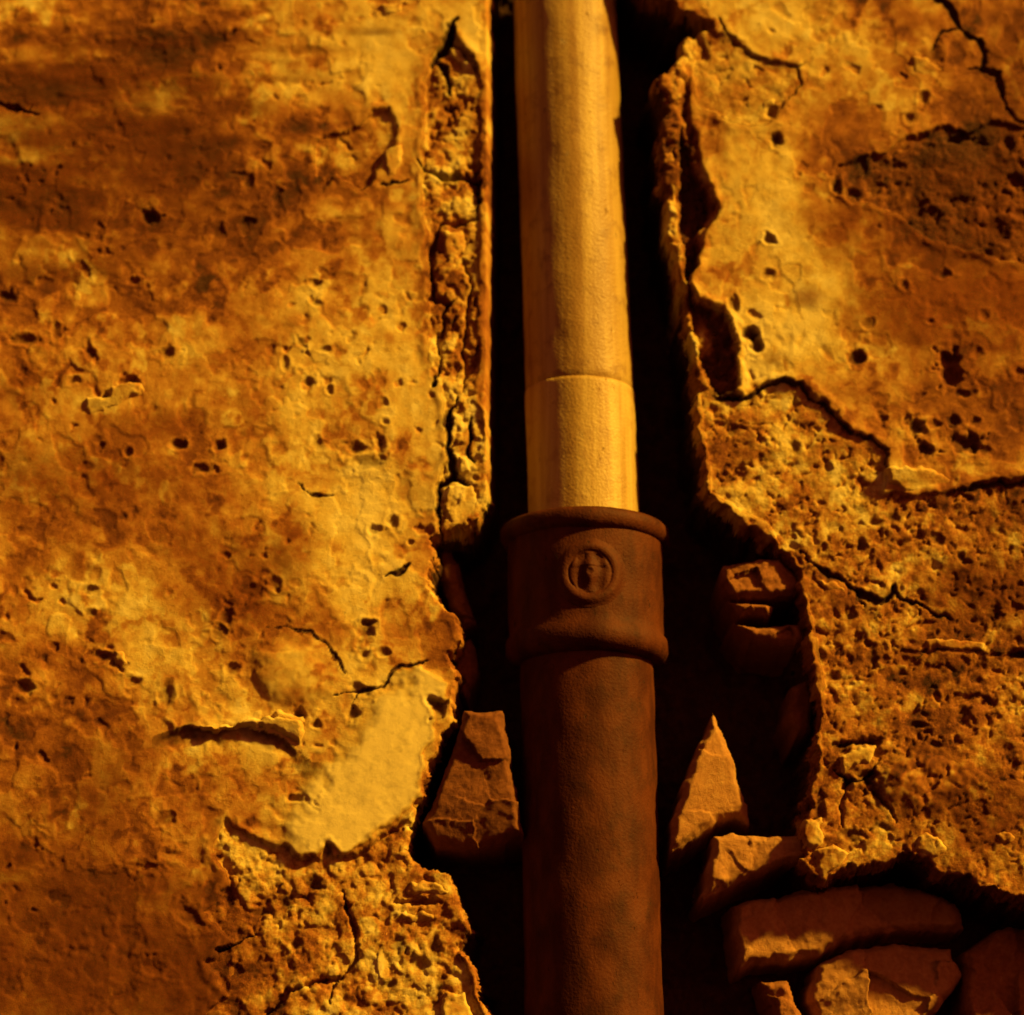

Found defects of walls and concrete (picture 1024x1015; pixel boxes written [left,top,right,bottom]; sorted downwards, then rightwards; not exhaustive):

crack [932,0,1024,125]
spalling [421,34,491,557]
crack [723,377,888,467]
spalling [652,28,1024,910]
crack [953,480,1024,493]
crack [800,551,952,620]
crack [266,626,428,709]
spalling [203,818,483,1015]